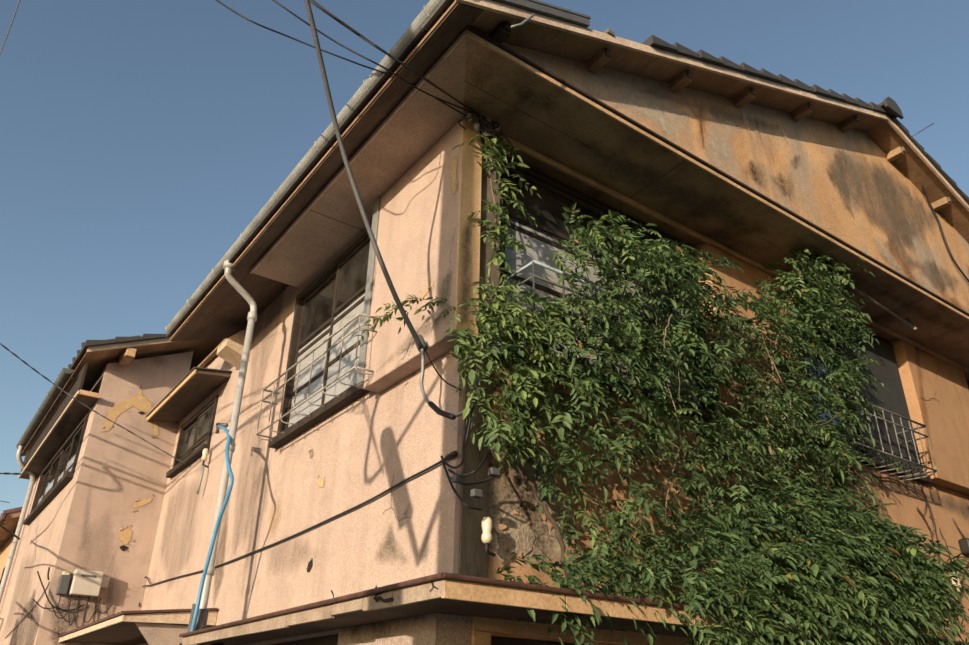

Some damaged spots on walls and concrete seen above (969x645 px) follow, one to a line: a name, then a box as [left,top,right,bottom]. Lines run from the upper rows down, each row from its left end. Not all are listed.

damp [624,93,689,136]
damp [831,154,953,291]
peeling [101,378,159,438]
peeling [119,524,134,551]